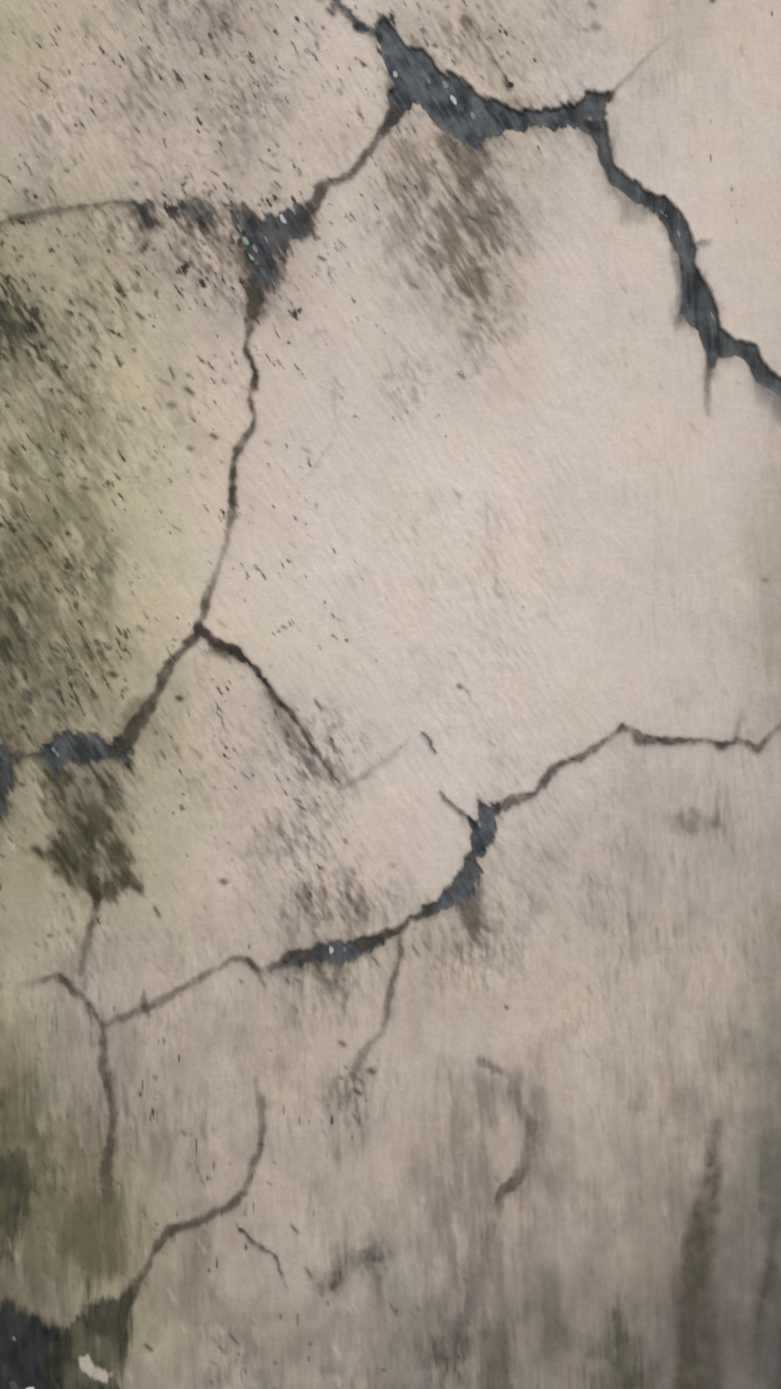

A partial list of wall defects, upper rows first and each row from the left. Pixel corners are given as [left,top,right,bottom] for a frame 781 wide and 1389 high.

crack [331,0,382,38]
crack [462,15,513,88]
crack [303,105,401,216]
crack [585,121,781,410]
crack [228,276,261,525]
crack [109,588,340,784]
crack [421,732,436,754]
crack [440,723,767,823]
crack [355,907,432,1016]
crack [45,950,315,1176]
crack [118,1129,282,1355]
leakage [685,1155,718,1300]